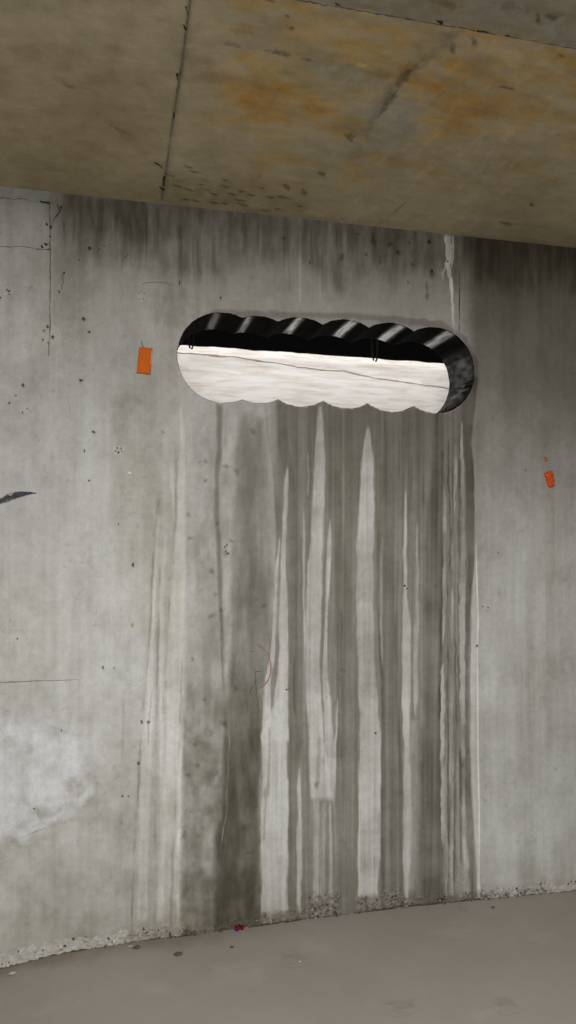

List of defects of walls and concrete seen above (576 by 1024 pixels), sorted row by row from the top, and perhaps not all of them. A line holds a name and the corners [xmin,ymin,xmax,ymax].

corrosion [257,0,576,119]
damp [40,165,576,930]